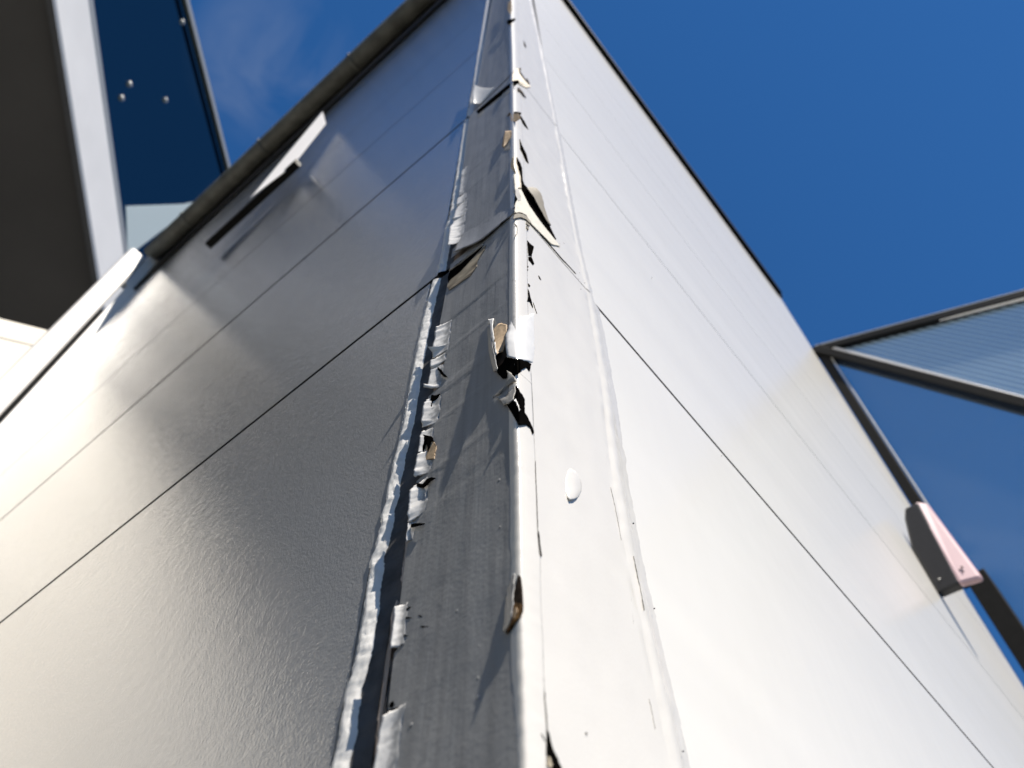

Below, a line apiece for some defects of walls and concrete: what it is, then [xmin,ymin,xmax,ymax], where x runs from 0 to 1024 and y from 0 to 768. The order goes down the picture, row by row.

peeling [473,68,531,118]
peeling [447,111,560,290]
peeling [487,240,541,434]
peeling [406,320,452,542]
peeling [390,602,408,649]
peeling [503,573,524,634]
peeling [373,703,406,768]